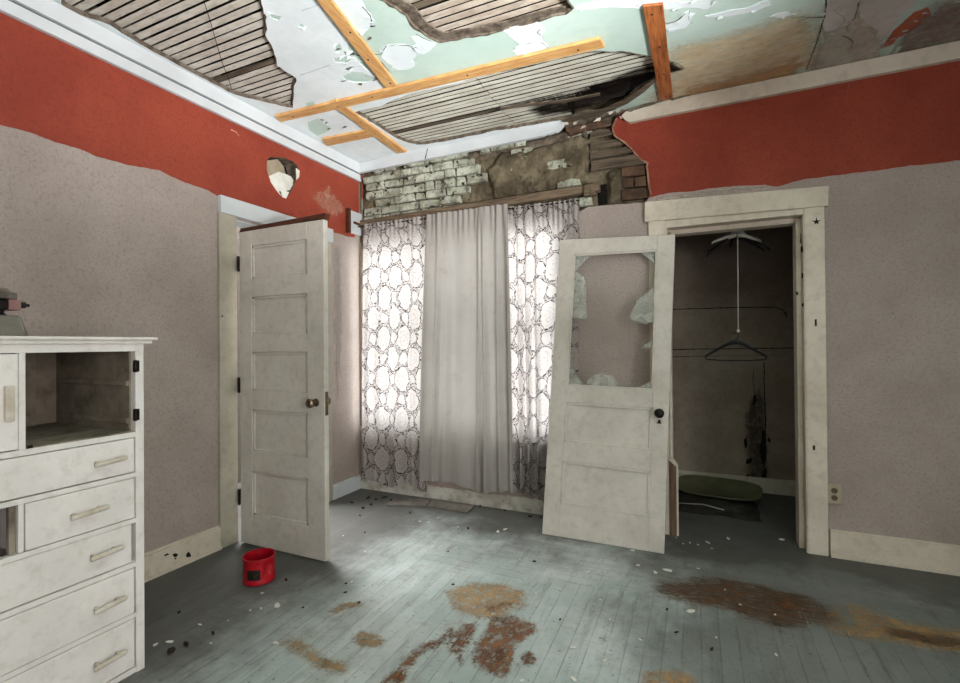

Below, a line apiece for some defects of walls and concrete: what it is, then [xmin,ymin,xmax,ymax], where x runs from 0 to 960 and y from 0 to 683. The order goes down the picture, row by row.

water stain [654,1,960,102]
crack [791,0,859,70]
peeling [820,0,931,48]
peeling [53,0,796,220]